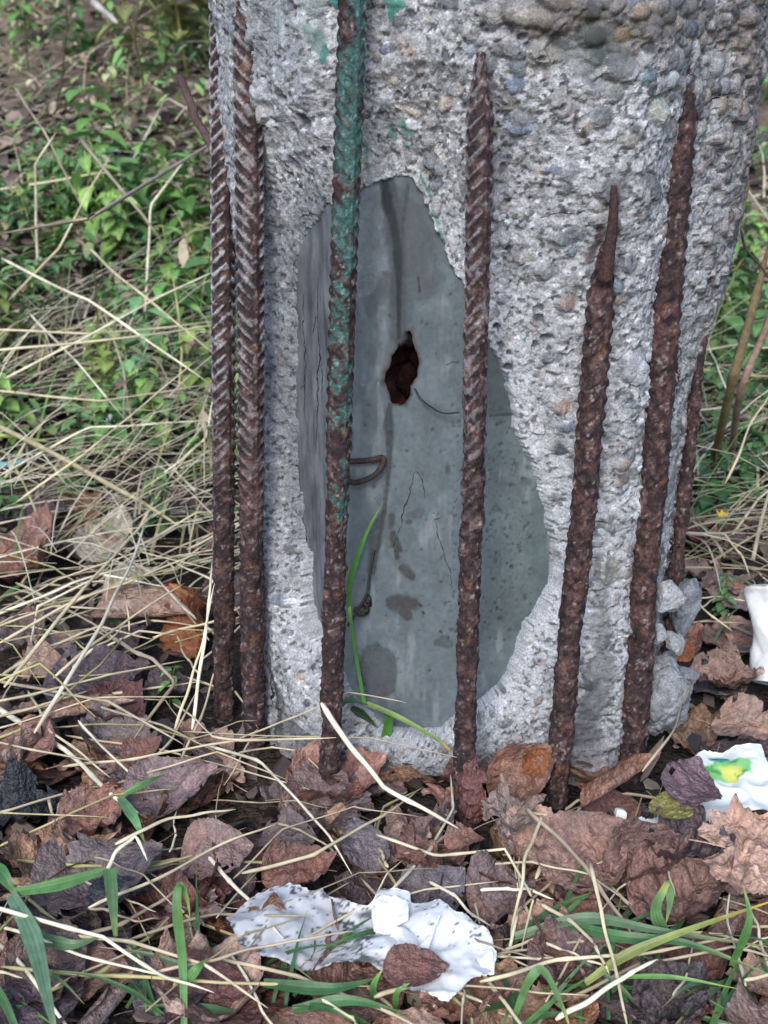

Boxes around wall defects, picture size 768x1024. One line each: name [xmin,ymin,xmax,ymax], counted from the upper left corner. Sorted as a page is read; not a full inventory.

corrosion [683,73,696,109]
corrosion [586,217,621,263]
spalling [287,0,550,828]
crack [393,471,425,552]